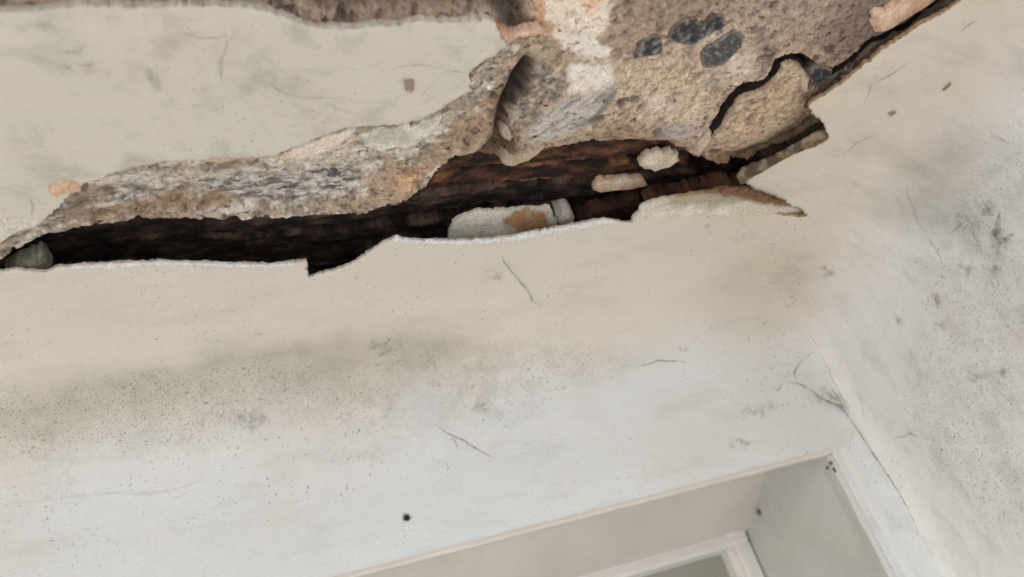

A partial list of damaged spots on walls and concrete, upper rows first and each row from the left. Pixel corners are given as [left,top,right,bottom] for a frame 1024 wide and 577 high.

spalling [0,0,951,259]
crack [709,0,938,136]